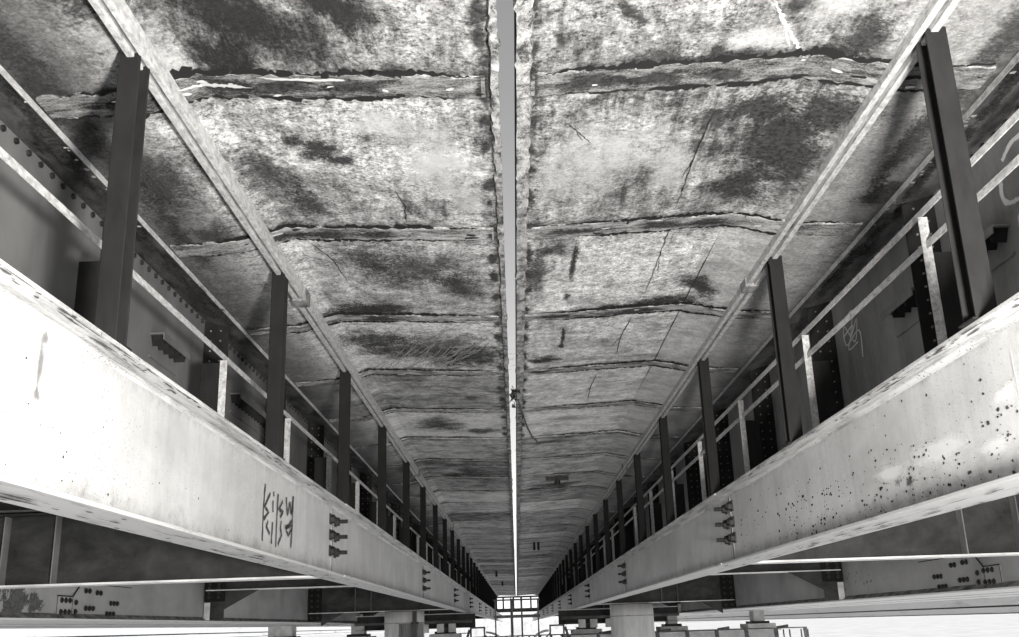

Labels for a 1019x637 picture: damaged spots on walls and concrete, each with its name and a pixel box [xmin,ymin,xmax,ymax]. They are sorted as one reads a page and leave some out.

leakage [62,0,100,31]
leakage [125,0,155,36]
leakage [164,30,253,73]
leakage [302,0,383,38]
leakage [621,22,785,65]
leakage [810,15,894,60]
spalling [55,89,117,120]
leakage [179,83,247,91]
spalling [170,66,480,104]
crack [646,107,717,289]
crack [640,229,722,387]
leakage [35,333,48,399]